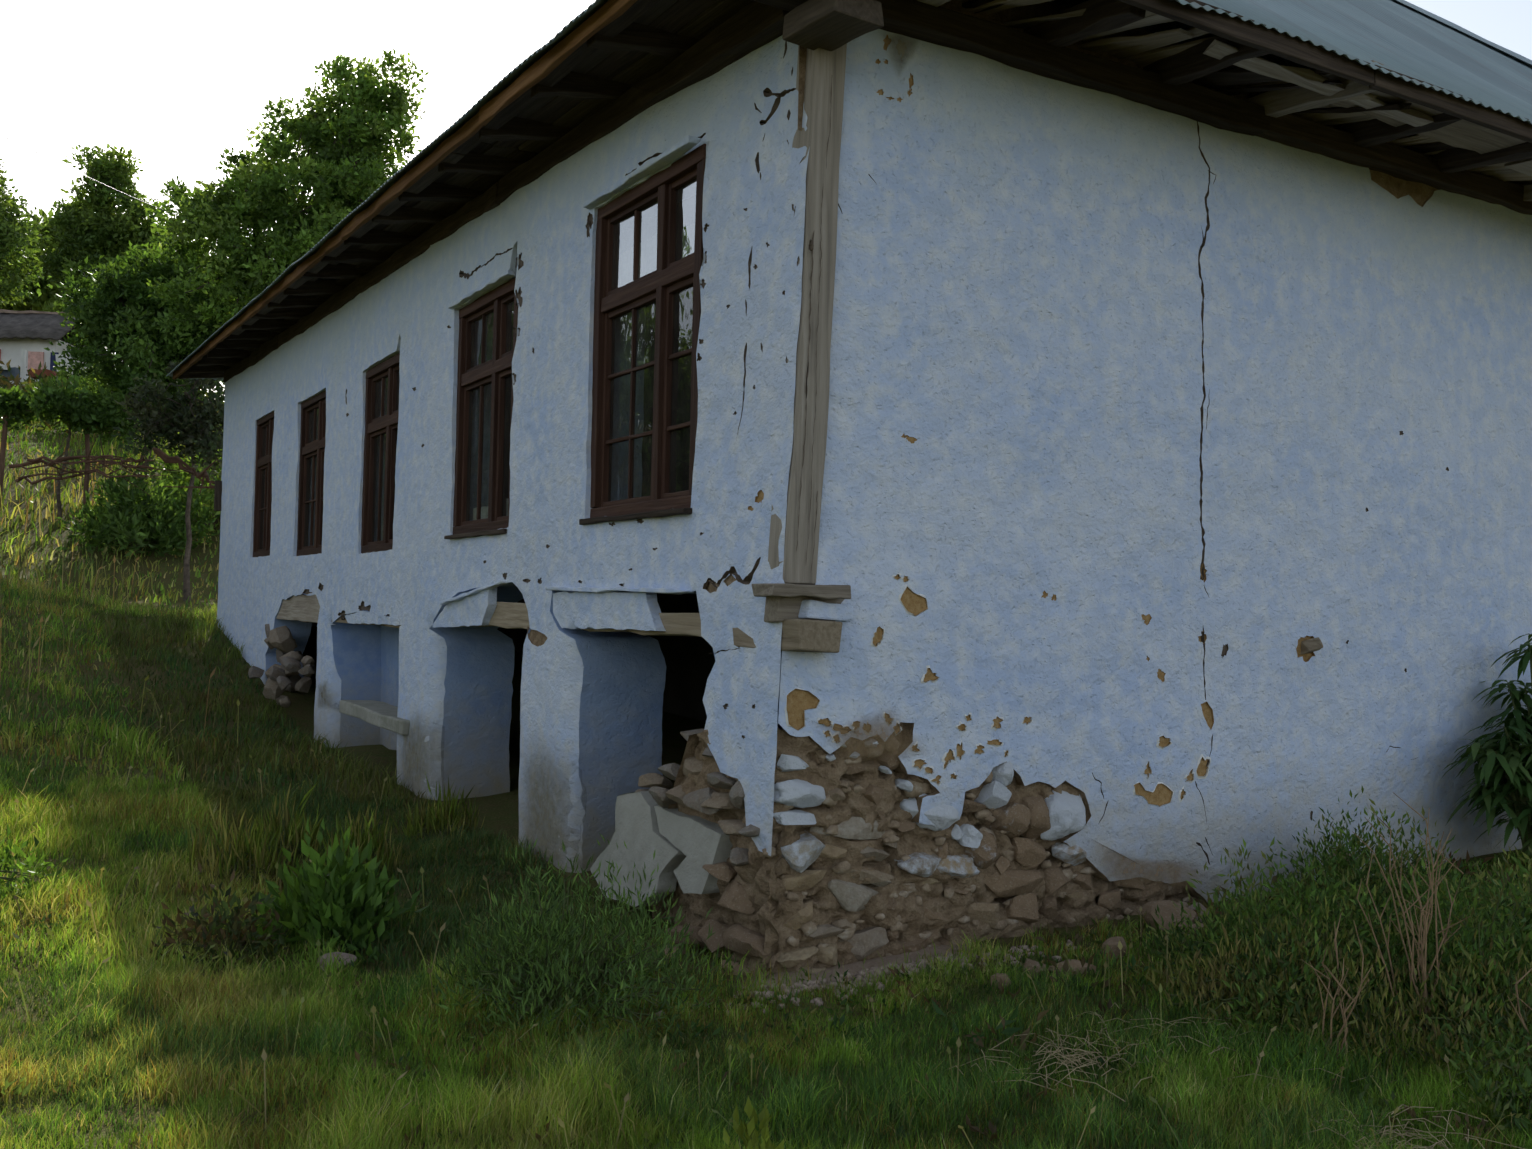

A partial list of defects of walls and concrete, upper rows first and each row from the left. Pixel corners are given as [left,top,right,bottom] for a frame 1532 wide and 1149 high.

crack [754,41,807,180]
spalling [1369,169,1439,207]
crack [459,248,512,279]
crack [738,248,763,430]
crack [1195,122,1216,865]
crack [703,557,761,589]
peeling [892,573,928,616]
flaking render [1296,636,1315,662]
peeling [1201,702,1214,729]
spalling [590,688,1211,979]